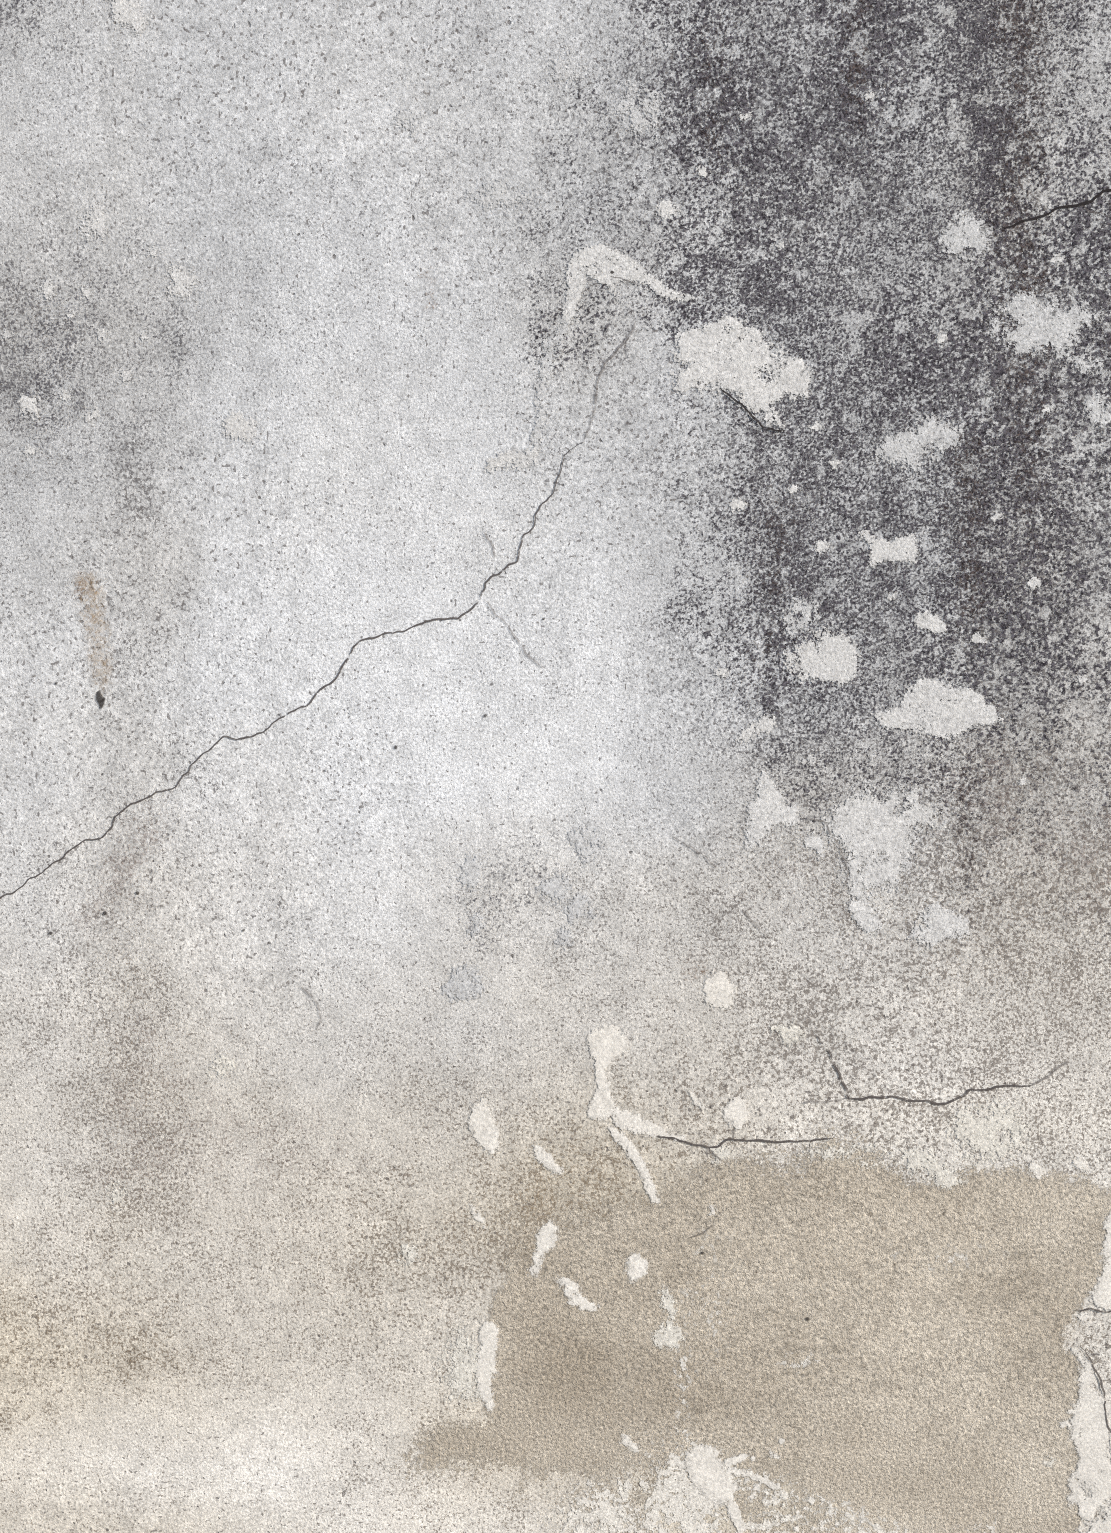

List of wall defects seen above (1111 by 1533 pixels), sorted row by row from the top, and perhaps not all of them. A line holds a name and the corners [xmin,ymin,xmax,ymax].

crack [0,442,583,899]
water stain [519,0,1111,914]
crack [657,1136,833,1148]
flaking render [390,1091,1111,1533]
crack [818,1036,1032,1105]